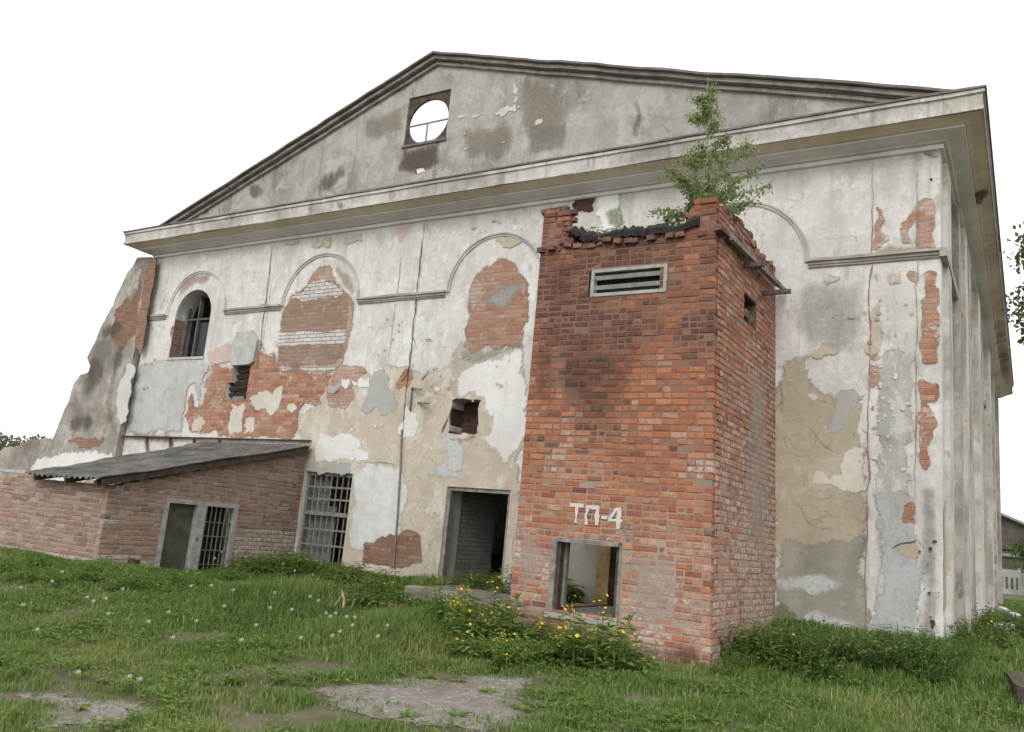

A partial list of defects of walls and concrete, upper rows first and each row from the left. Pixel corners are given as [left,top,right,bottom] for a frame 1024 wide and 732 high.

water stain [399,146,437,172]
water stain [523,81,564,150]
spalling [872,197,936,250]
spalling [110,258,173,390]
crack [388,230,431,437]
flaking render [184,264,526,590]
flaking render [775,270,946,629]